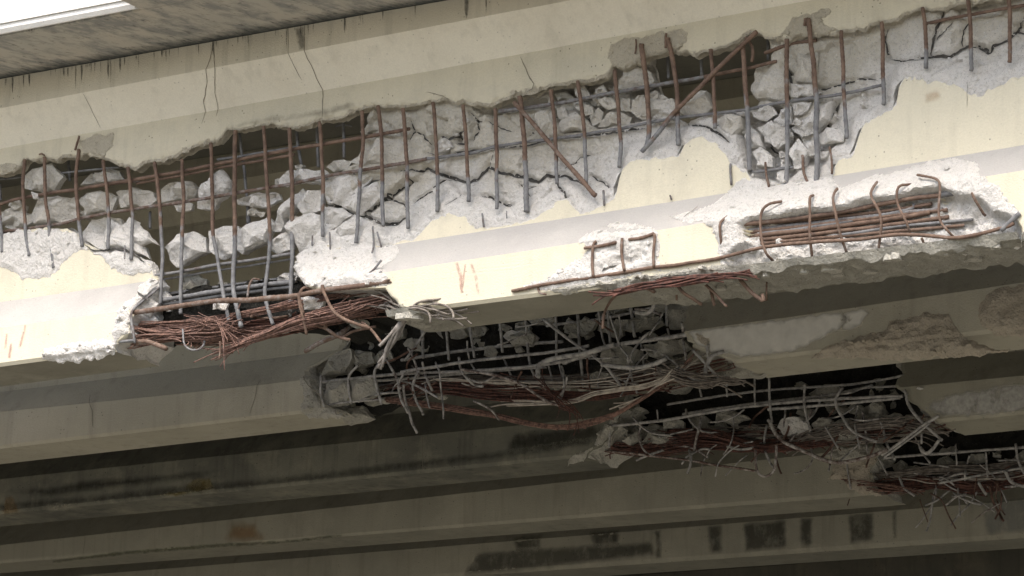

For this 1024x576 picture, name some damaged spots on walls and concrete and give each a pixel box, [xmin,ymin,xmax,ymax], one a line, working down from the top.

crack [203,42,218,119]
crack [288,25,323,114]
crack [821,12,1024,128]
spalling [0,163,22,173]
spalling [79,132,114,158]
spalling [293,0,1024,306]
spalling [0,228,158,364]
spalling [385,307,467,332]
spalling [811,311,1010,362]
spalling [568,412,624,465]